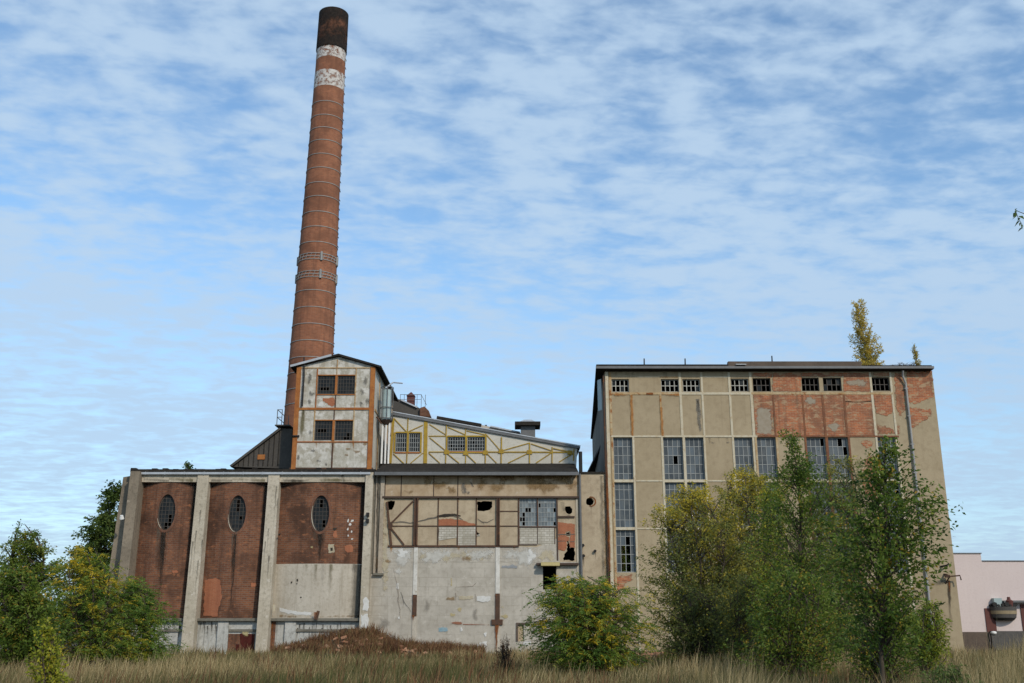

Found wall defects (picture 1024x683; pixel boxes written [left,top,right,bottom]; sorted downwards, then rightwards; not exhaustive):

flaking render [752,371,934,495]
peeling [377,510,575,591]